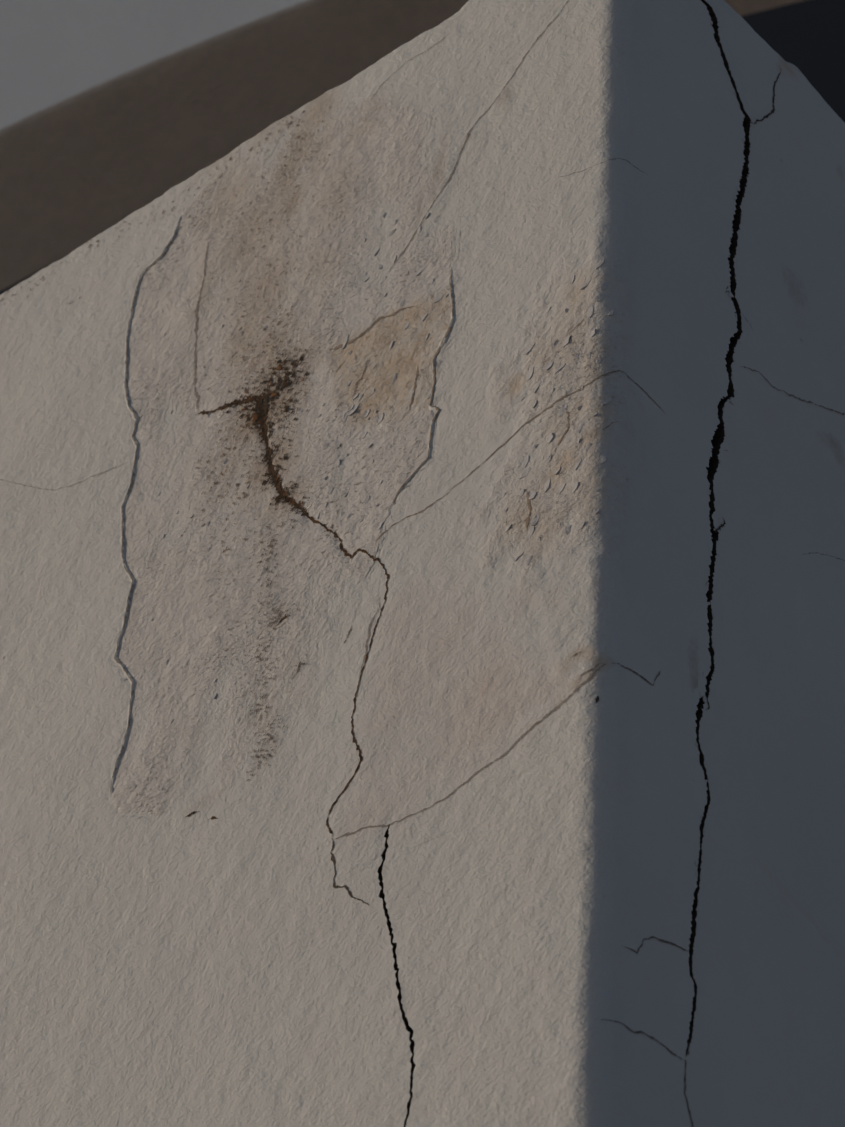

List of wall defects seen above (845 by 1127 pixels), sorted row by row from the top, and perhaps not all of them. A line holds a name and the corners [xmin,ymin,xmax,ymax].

peeling [107,215,253,822]
damp [154,315,337,836]
corrosion [148,107,374,573]
damp [118,54,419,395]
peeling [292,49,467,745]
damp [402,109,459,273]
damp [302,544,619,873]
crack [193,0,845,1127]